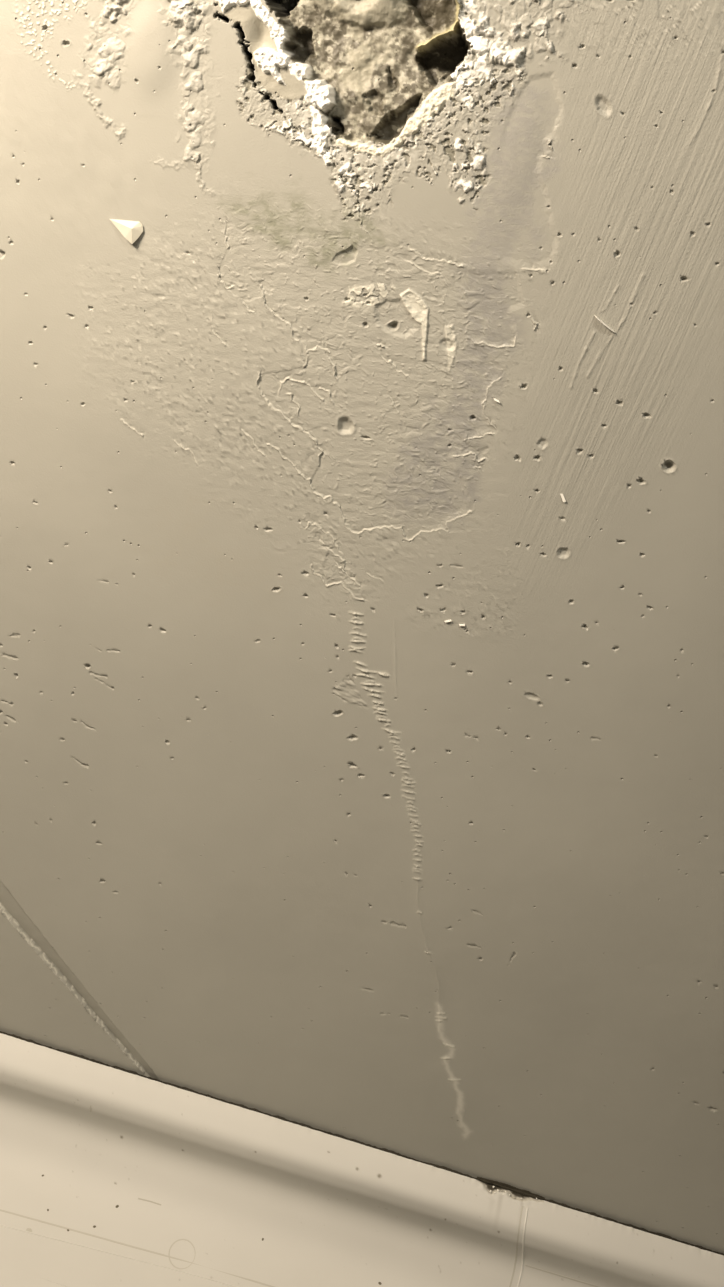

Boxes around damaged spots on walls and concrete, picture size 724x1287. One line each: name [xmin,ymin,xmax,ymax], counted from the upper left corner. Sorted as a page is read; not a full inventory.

spalling [214,0,474,168]
crack [345,577,476,1143]